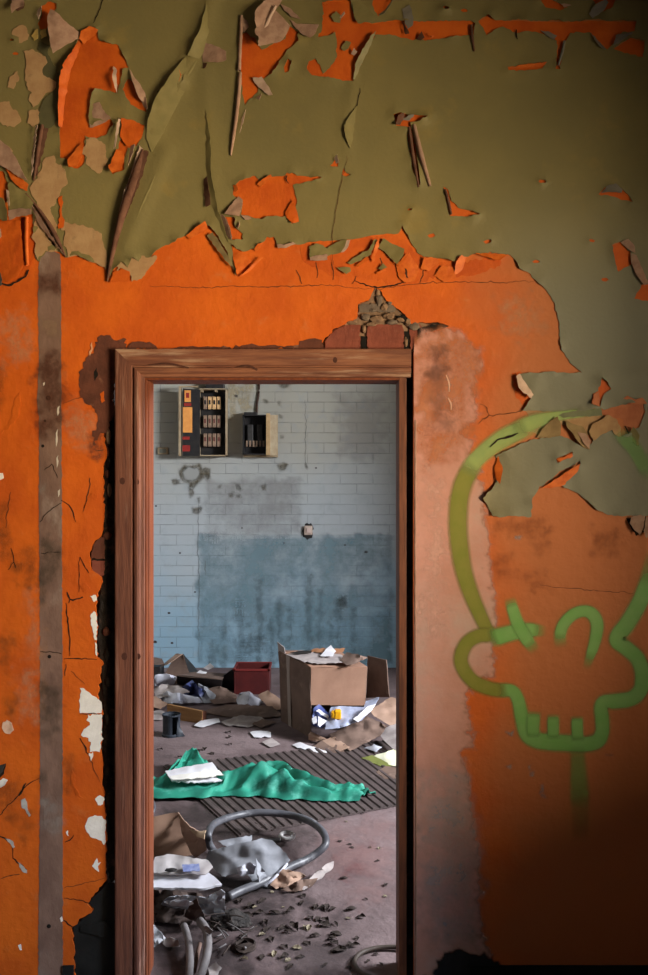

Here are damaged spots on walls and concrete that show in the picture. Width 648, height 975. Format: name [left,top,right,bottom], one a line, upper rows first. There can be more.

peeling [230,0,644,156]
peeling [0,2,157,286]
peeling [225,173,319,277]
crack [152,91,532,290]
peeling [394,113,431,188]
peeling [613,239,648,301]
crack [478,404,520,447]
peeling [512,371,647,488]
crack [40,464,91,522]
leakage [173,464,210,513]
crack [40,552,97,684]
flaking render [73,235,508,975]